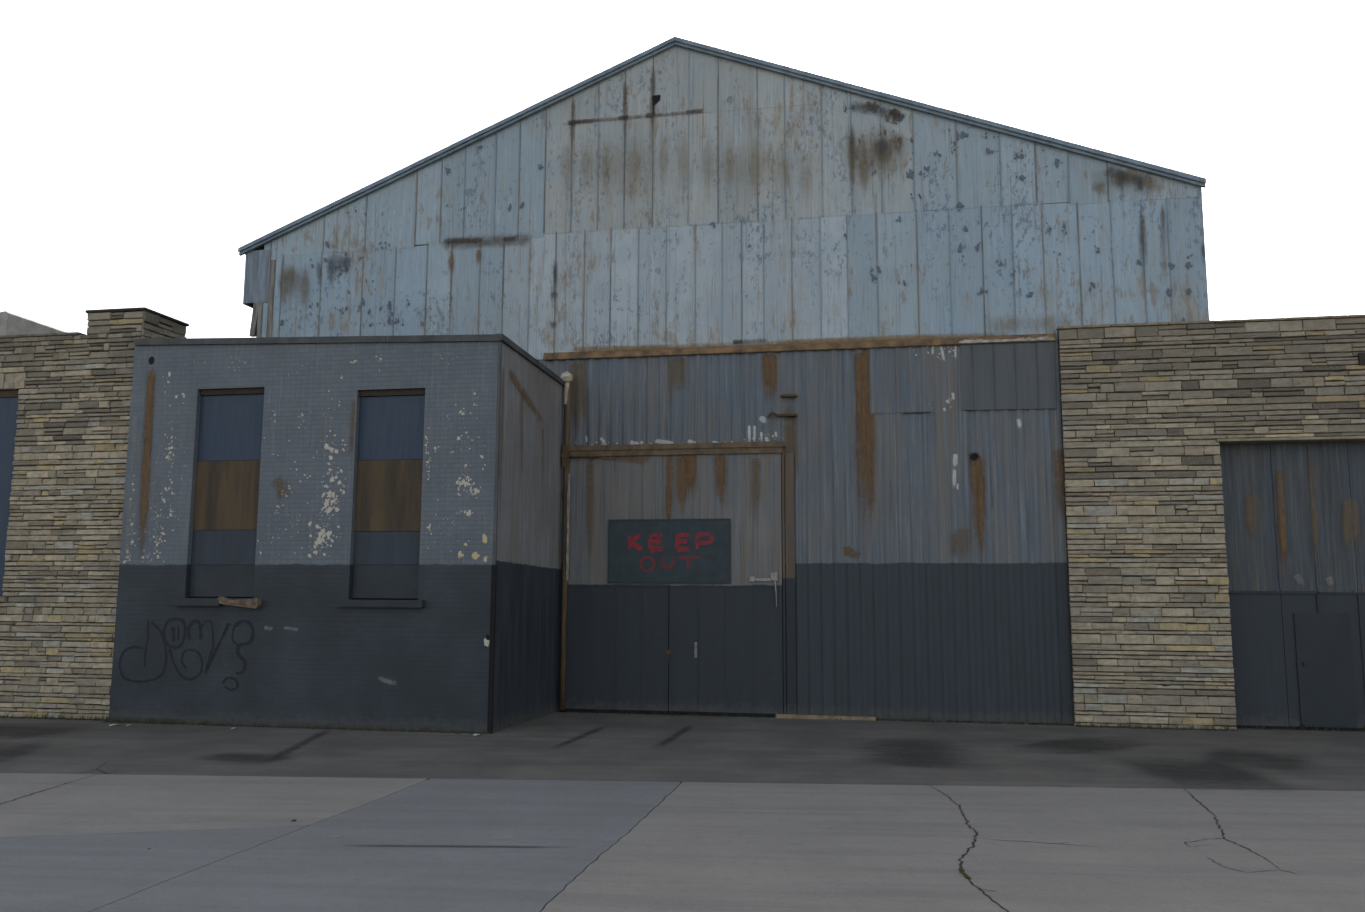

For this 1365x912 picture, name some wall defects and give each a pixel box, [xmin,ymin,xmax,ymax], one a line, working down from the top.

rust [141,371,154,533]
peeling [123,372,186,564]
peeling [257,360,357,558]
peeling [425,392,488,562]
rust [666,455,696,519]
rust [575,335,986,496]
rust [969,452,984,546]
crack [0,761,119,804]
crack [930,785,1096,912]
crack [1183,788,1301,875]